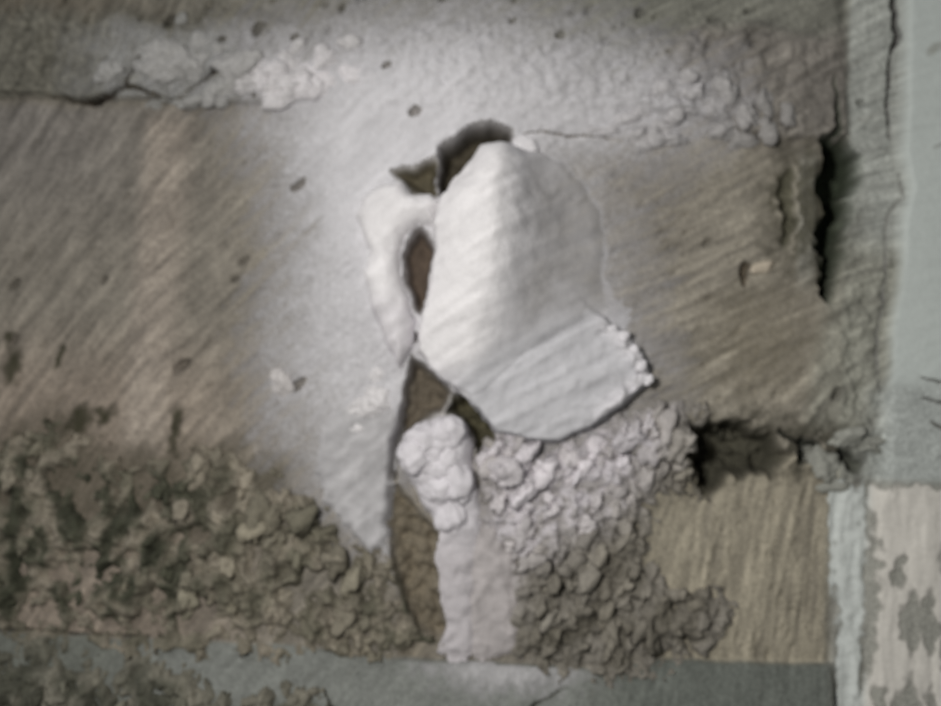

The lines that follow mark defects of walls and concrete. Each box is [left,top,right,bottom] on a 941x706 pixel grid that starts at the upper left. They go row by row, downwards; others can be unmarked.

crack [2,54,219,108]
crack [885,0,903,142]
leakage [242,3,717,691]
crack [874,172,907,389]
spalling [0,418,448,706]
spalling [469,309,941,706]